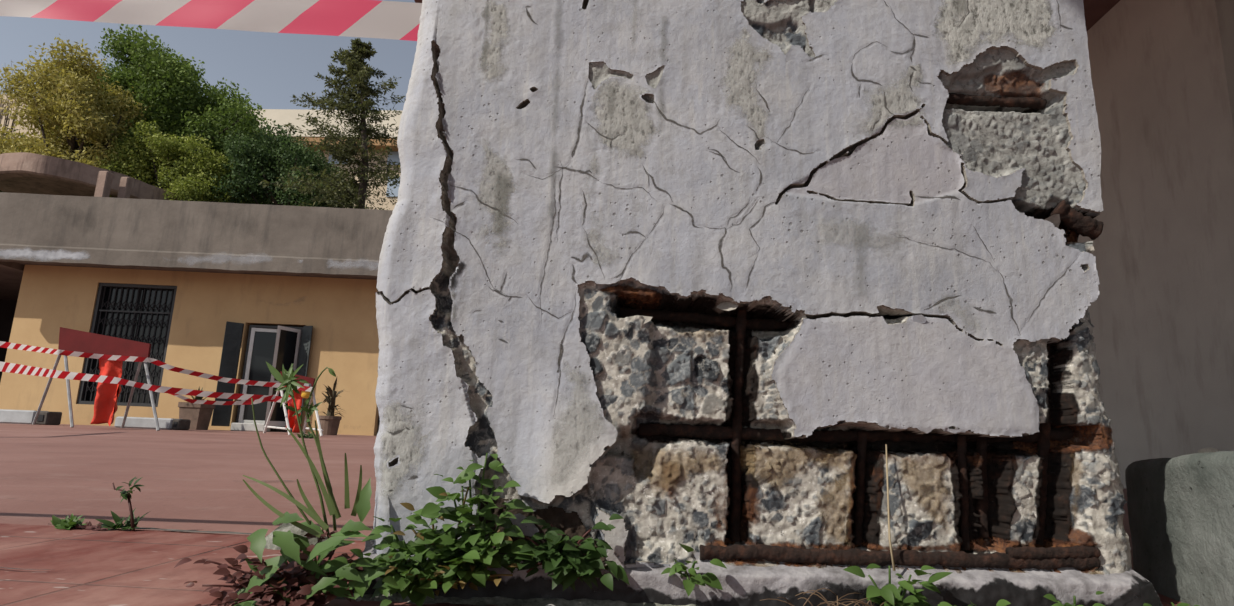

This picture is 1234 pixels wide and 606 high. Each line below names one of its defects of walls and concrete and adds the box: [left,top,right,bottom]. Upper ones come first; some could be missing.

spalling [741,0,838,57]
peeling [867,64,923,133]
corrosion [983,71,1043,113]
spalling [935,0,1101,228]
crack [377,1,1082,458]
corrosion [1024,207,1090,244]
spalling [1065,235,1095,272]
spalling [474,278,1132,575]
corrosion [600,285,1113,571]